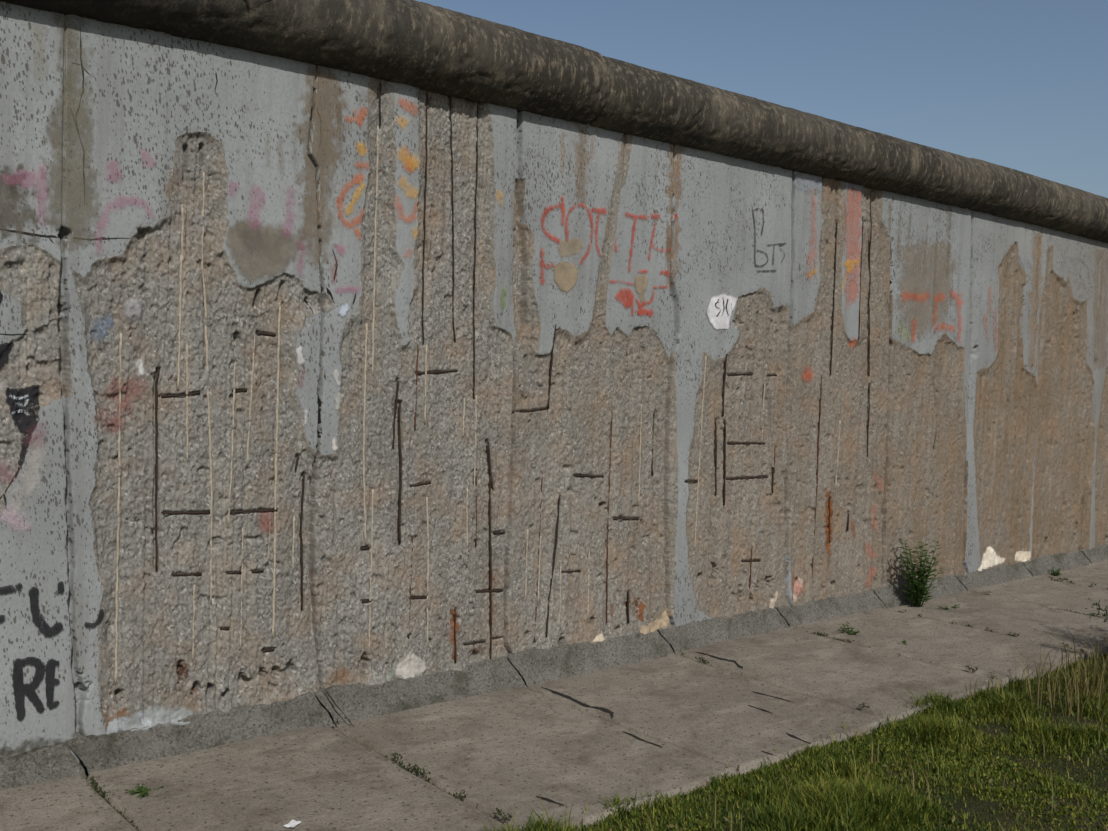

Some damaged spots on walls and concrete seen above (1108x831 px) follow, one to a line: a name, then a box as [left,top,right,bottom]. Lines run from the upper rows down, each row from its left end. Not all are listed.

water stain [0,164,37,241]
water stain [49,19,96,243]
crack [72,19,89,178]
spalling [0,77,1108,734]